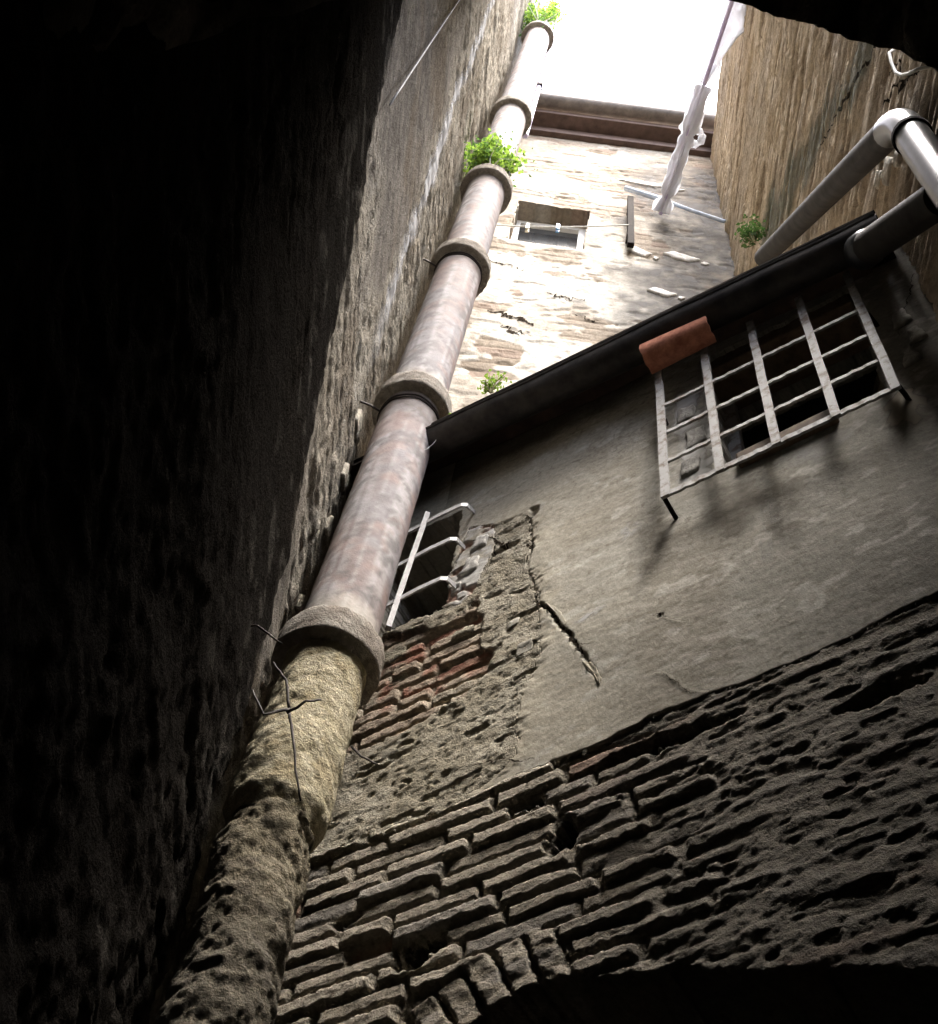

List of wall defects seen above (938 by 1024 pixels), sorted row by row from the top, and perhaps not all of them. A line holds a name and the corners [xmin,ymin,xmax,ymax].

peeling [354,409,363,443]
peeling [340,462,350,496]
peeling [294,594,305,615]
crack [473,515,602,684]
spalling [311,515,541,854]
spalling [567,828,579,850]